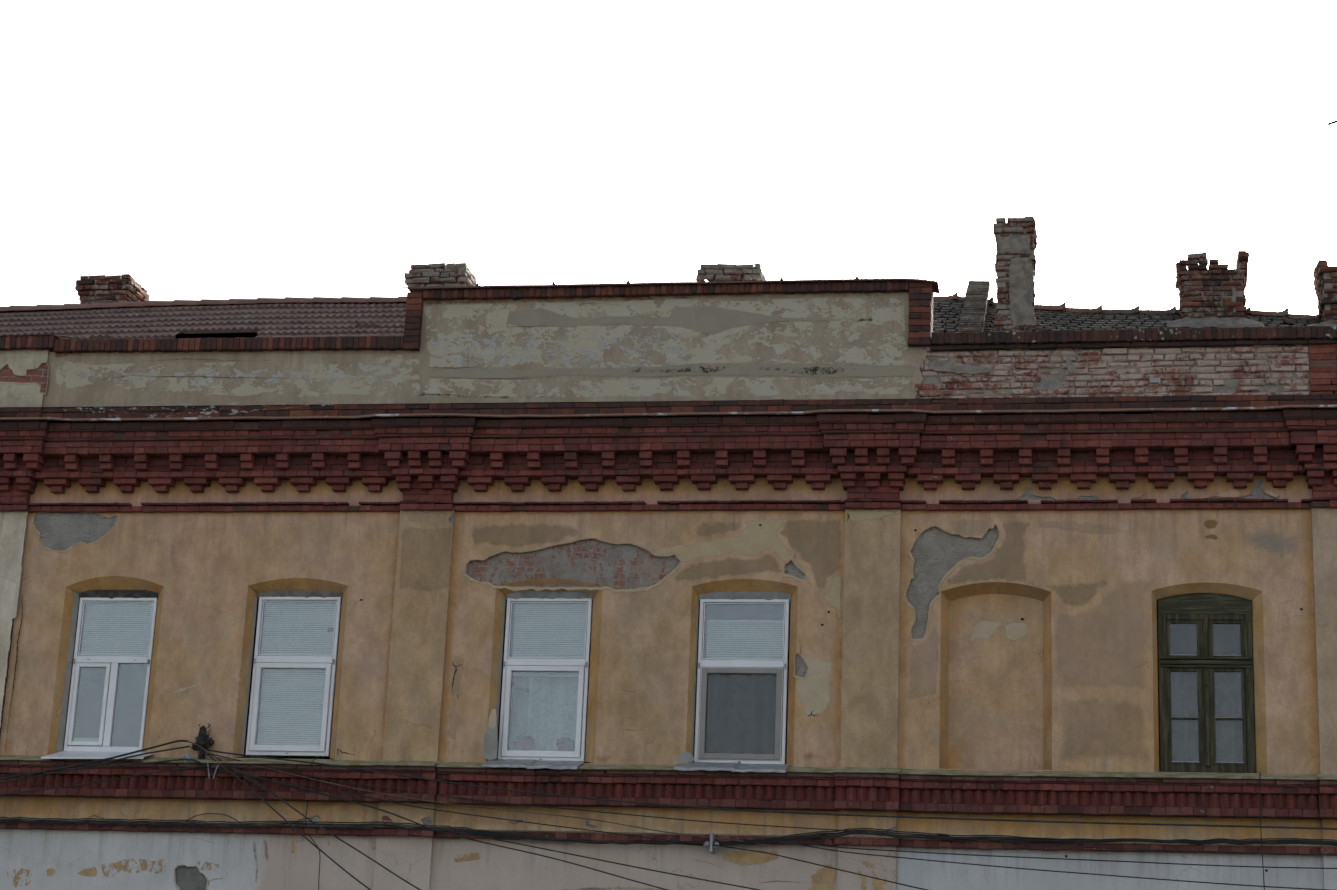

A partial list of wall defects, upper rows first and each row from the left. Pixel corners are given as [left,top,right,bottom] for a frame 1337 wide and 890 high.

peeling [0,297,1310,418]
flaking render [32,512,118,553]
flaking render [464,537,681,593]
flaking render [905,524,1001,642]
flaking render [77,859,220,890]